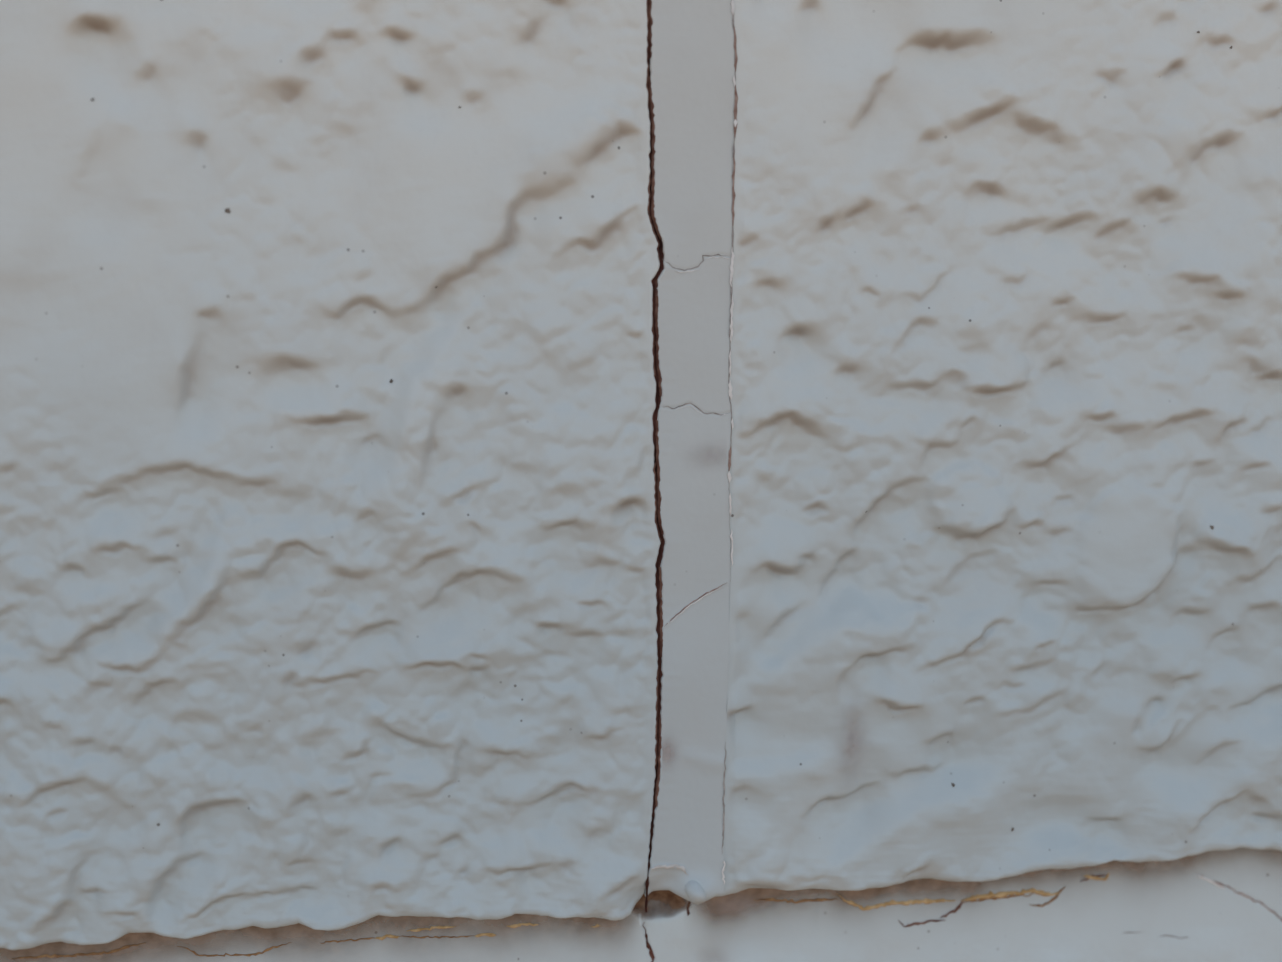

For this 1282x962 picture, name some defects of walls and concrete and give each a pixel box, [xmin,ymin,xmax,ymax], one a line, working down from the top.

crack [642,0,738,962]
crack [1196,874,1282,921]